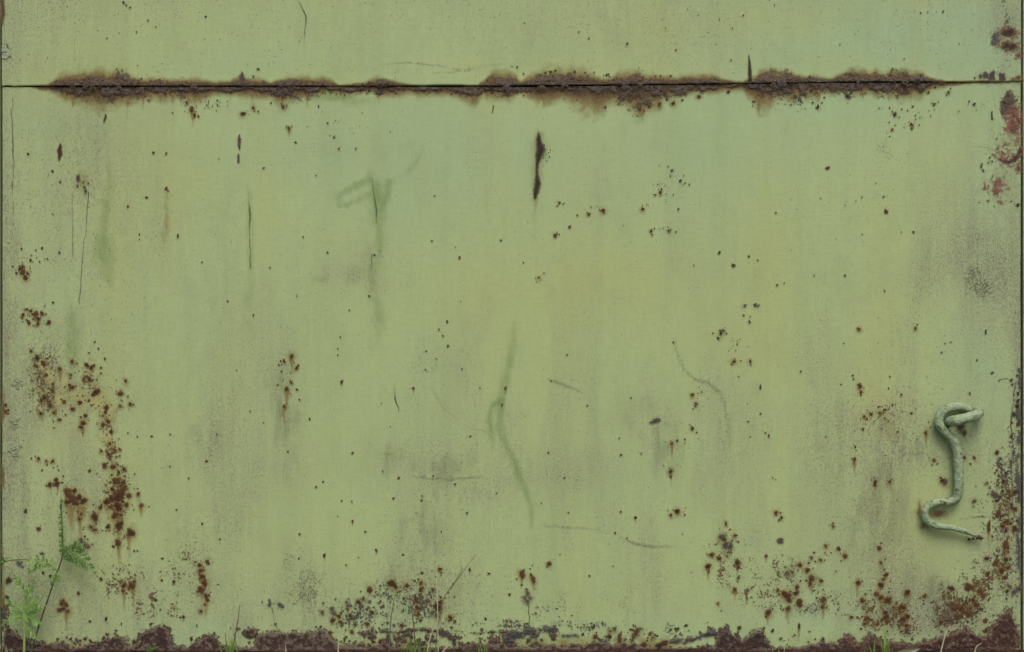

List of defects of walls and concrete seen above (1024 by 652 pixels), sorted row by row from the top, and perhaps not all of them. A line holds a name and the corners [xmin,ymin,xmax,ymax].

corrosion [33,58,1021,137]
corrosion [277,351,300,415]
corrosion [26,339,153,552]
corrosion [56,598,87,646]
corrosion [195,560,219,627]
corrosion [318,567,574,648]
corrosion [581,624,699,649]
corrosion [705,521,768,594]
corrosion [759,544,848,648]
corrosion [848,442,1022,643]